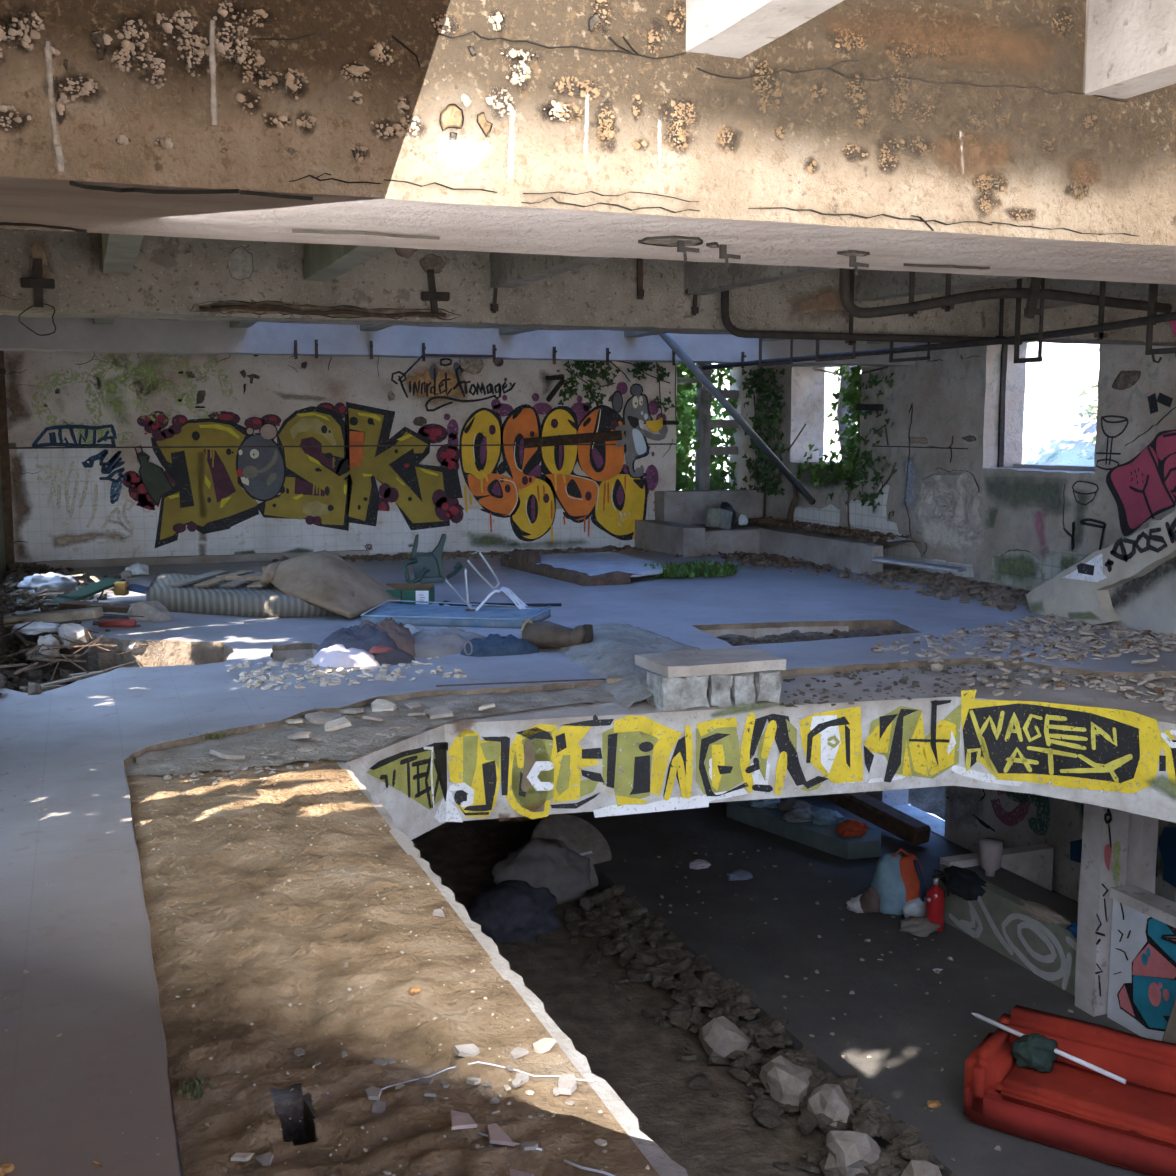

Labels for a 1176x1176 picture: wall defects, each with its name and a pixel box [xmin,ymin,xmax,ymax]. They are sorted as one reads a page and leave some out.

crack [392,35,420,67]
crack [437,31,1128,102]
leakage [45,42,64,172]
leakage [723,30,1145,180]
crack [69,173,700,213]
crack [748,207,1137,236]
spalling [191,300,462,320]